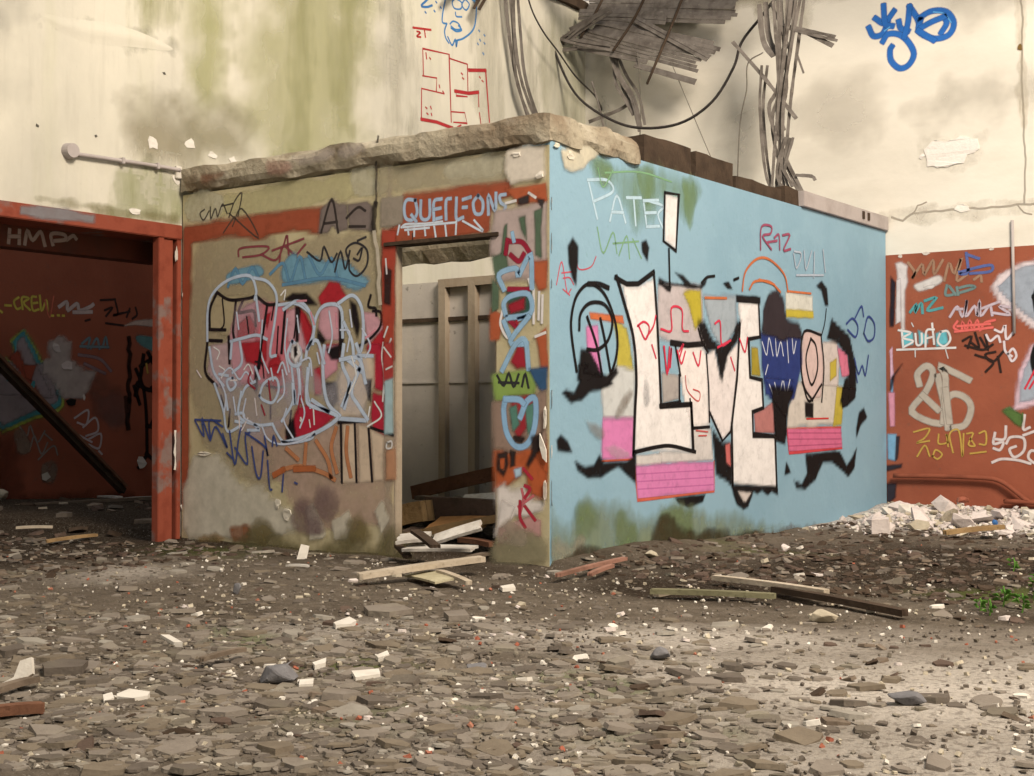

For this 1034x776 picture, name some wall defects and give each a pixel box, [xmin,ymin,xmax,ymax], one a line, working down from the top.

water stain [197,0,219,94]
water stain [263,0,357,154]
water stain [137,122,184,156]
spalling [919,136,979,168]
water stain [185,152,506,221]
water stain [189,235,412,560]
peeling [180,451,297,538]
peeling [309,504,353,539]
peeling [376,502,389,533]
water stain [651,515,729,541]
water stain [571,547,597,557]